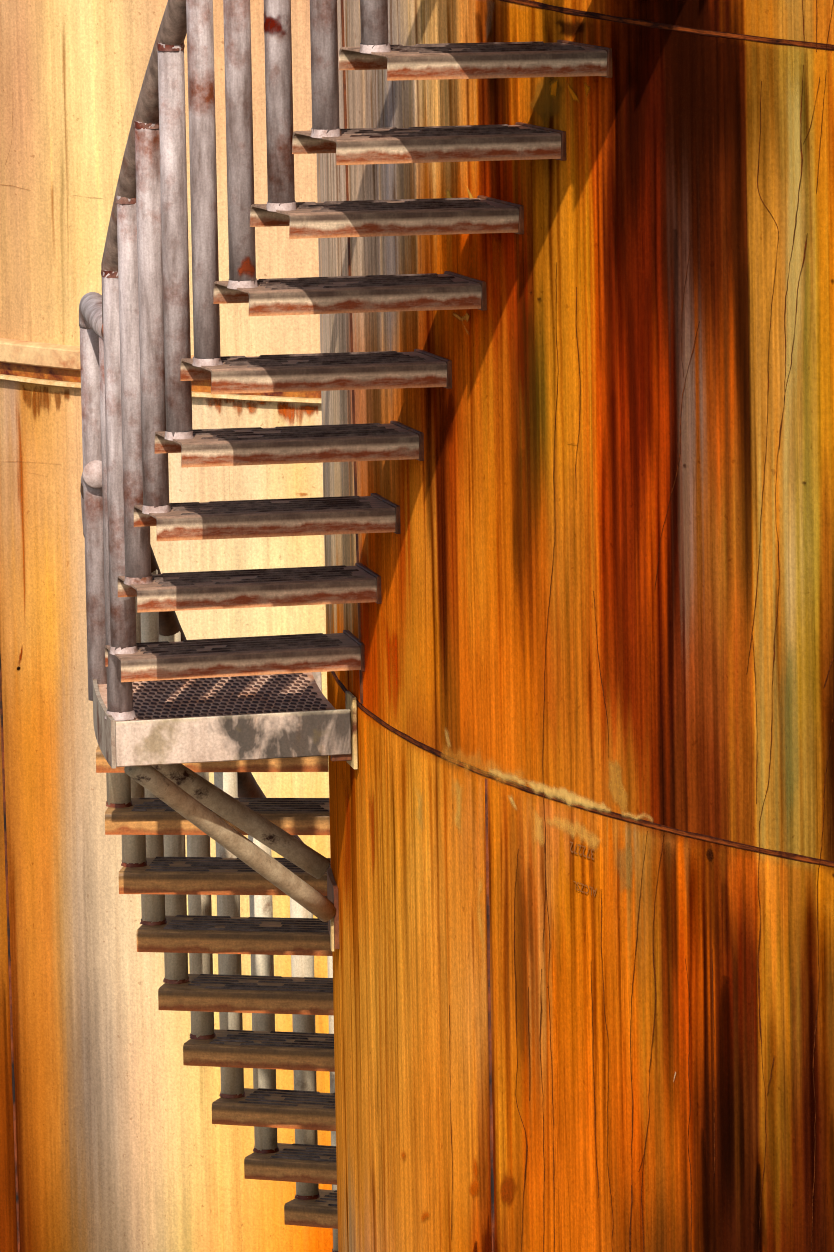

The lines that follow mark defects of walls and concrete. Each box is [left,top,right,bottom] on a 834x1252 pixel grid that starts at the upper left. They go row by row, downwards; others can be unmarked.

rust [23,385,69,417]
crack [746,0,834,1252]
crack [591,831,664,1252]
crack [685,959,715,1252]